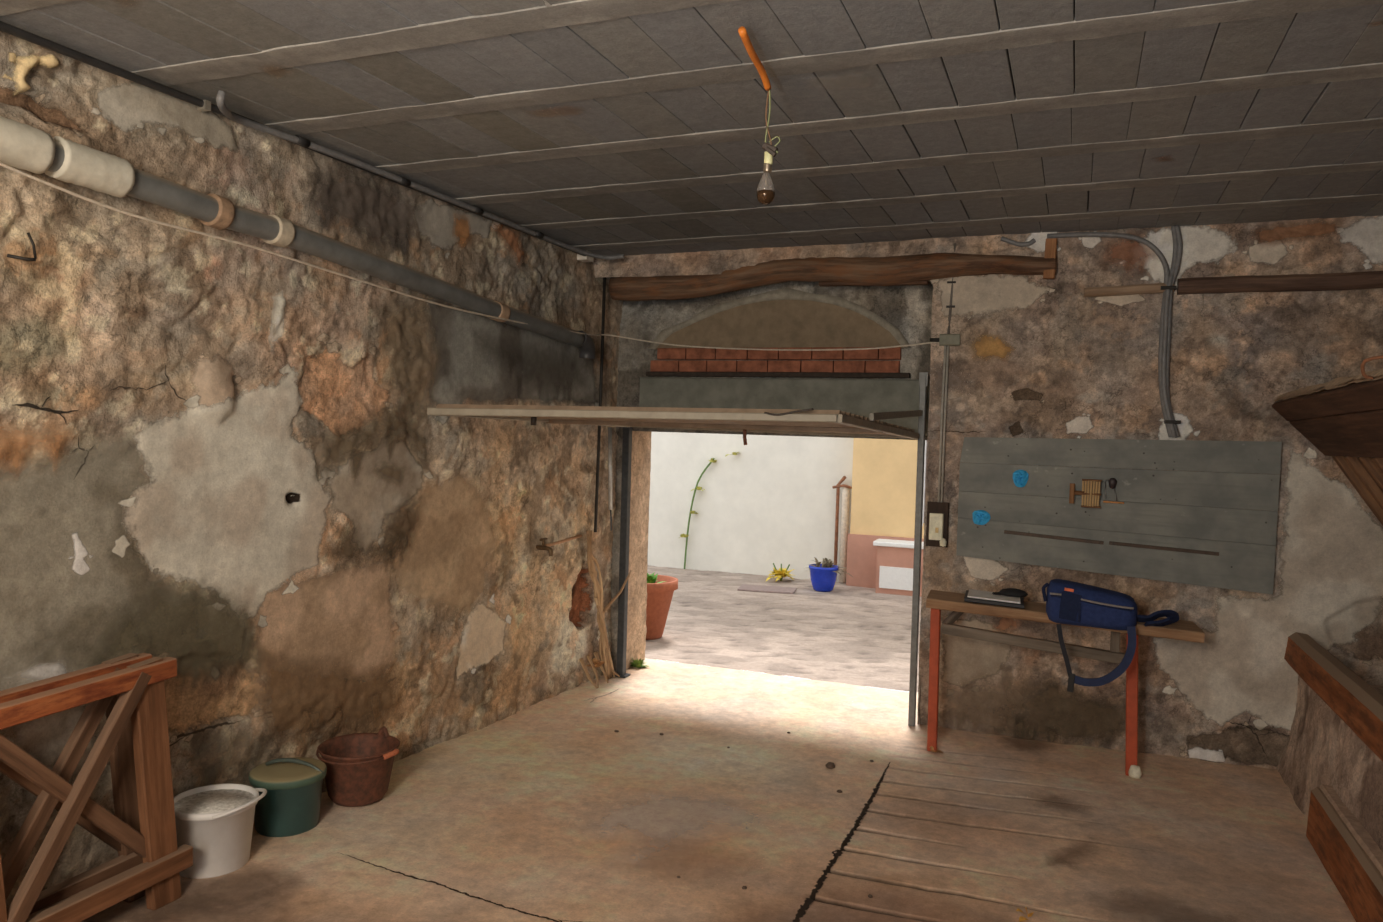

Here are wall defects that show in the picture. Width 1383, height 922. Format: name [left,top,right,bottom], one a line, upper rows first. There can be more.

spalling [0,53,87,136]
crack [15,396,95,479]
peeling [1303,447,1317,459]
peeling [118,497,136,507]
damp [69,533,92,575]
peeling [112,535,130,558]
spalling [1335,595,1383,665]
damp [17,665,65,686]
damp [101,595,396,745]
damp [17,704,85,770]
crack [793,762,890,922]
crack [341,853,582,922]